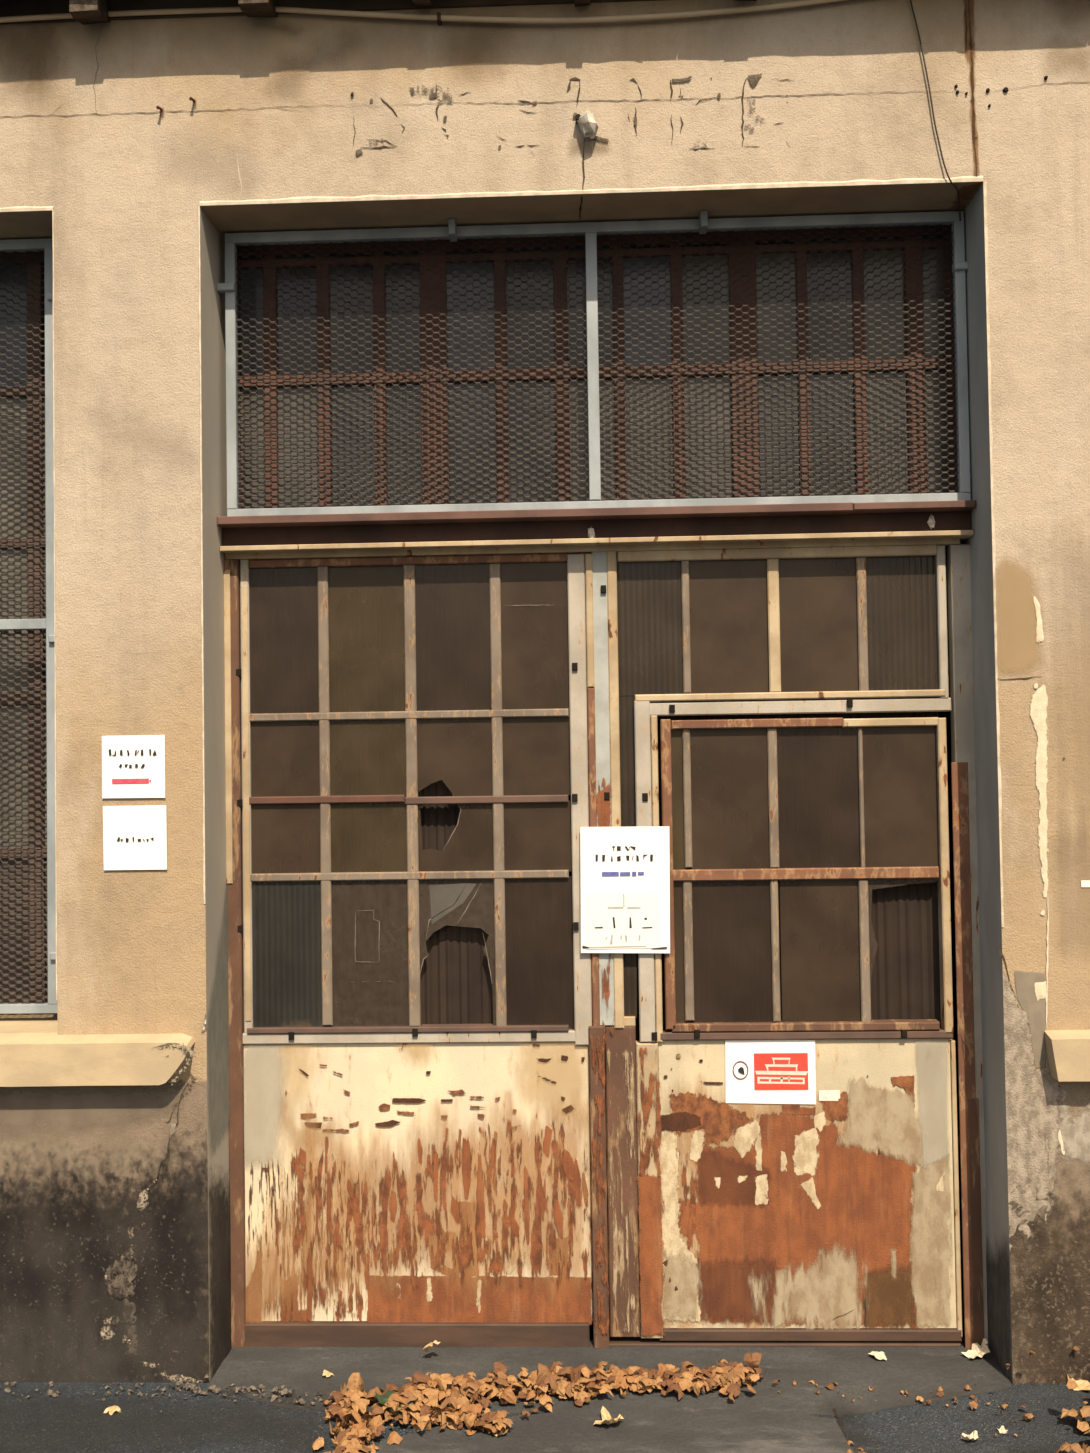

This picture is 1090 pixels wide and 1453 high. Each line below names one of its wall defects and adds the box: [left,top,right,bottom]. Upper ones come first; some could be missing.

peeling [1033,595,1044,643]
corrosion [596,777,611,827]
spalling [1002,683,1090,1250]
damp [0,884,282,1383]
peeling [300,1089,521,1132]
corrosion [246,953,615,1335]
peeling [607,1047,704,1337]
corrosion [660,1068,917,1329]
peeling [749,1247,867,1330]
peeling [715,1077,924,1209]
damp [986,1194,1090,1385]